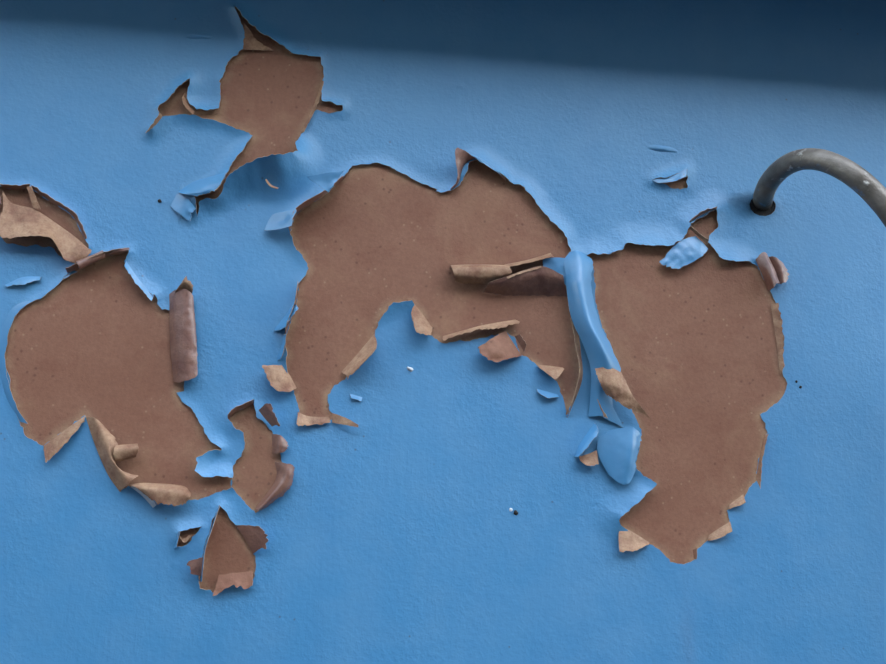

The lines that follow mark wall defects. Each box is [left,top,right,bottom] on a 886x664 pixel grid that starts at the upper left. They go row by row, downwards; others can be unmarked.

peeling [146,7,343,221]
peeling [0,183,295,513]
peeling [262,147,790,564]
peeling [174,506,269,596]